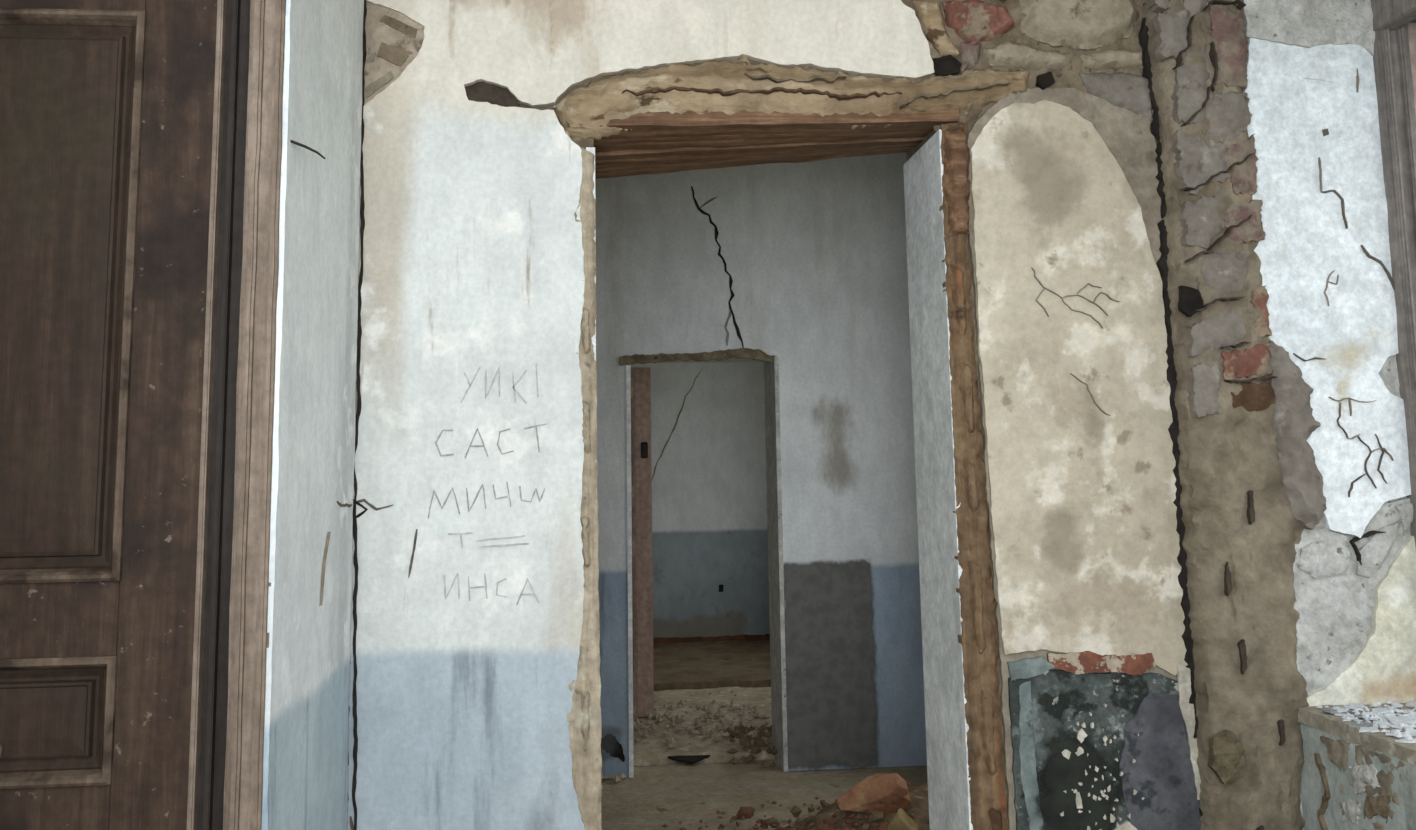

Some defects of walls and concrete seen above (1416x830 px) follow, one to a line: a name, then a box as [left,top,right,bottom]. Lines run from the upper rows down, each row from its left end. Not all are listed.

crack [691,186,744,348]
crack [1031,268,1120,328]
flaking render [901,0,1375,425]
crack [1318,157,1395,306]
crack [336,0,394,830]
crack [652,370,702,480]
crack [1328,397,1394,497]
flaking render [1378,354,1401,398]
flaking render [1293,498,1413,695]
peeling [1007,651,1201,830]
flaking render [1320,736,1409,830]